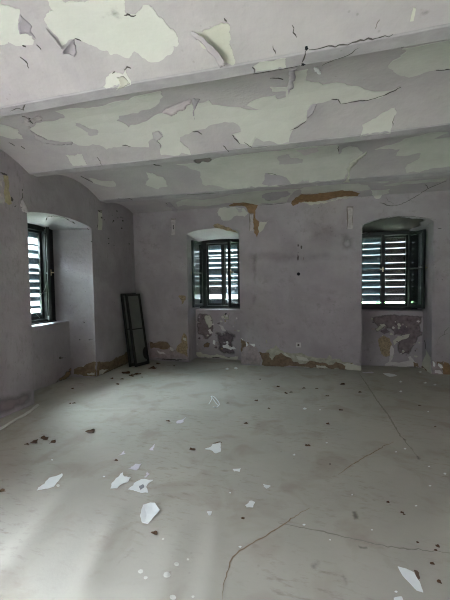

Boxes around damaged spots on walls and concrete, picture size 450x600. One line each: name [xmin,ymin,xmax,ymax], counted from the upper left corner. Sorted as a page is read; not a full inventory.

peeling [0,4,35,46]
peeling [44,0,179,62]
peeling [191,18,236,68]
crack [302,34,393,64]
peeling [0,58,401,206]
peeling [375,132,450,173]
peeling [213,202,269,236]
flaking render [74,352,128,377]
flaking render [148,333,188,360]
peeling [196,313,240,360]
flaking render [259,340,361,371]
peeling [371,315,423,368]